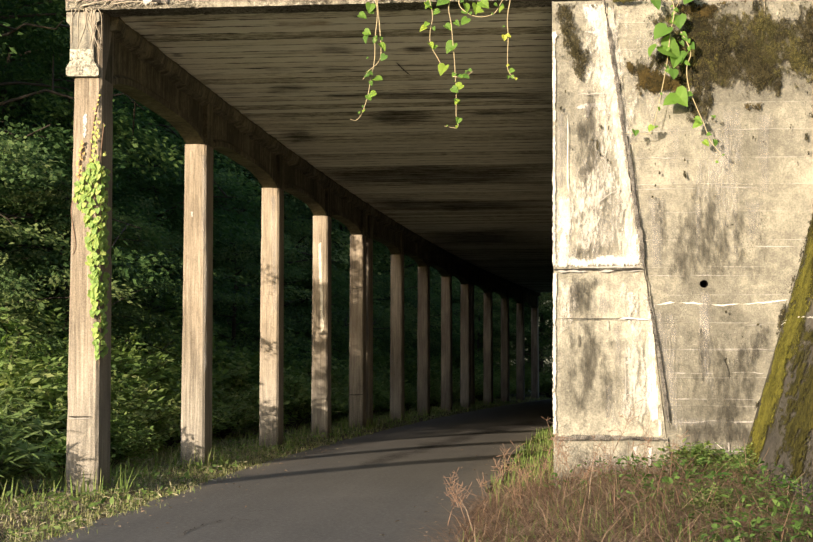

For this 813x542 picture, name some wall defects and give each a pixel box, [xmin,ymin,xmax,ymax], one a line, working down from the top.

leakage [555,4,641,268]
leakage [674,190,744,279]
leakage [558,277,605,415]
leakage [614,288,662,436]
leakage [686,343,759,451]